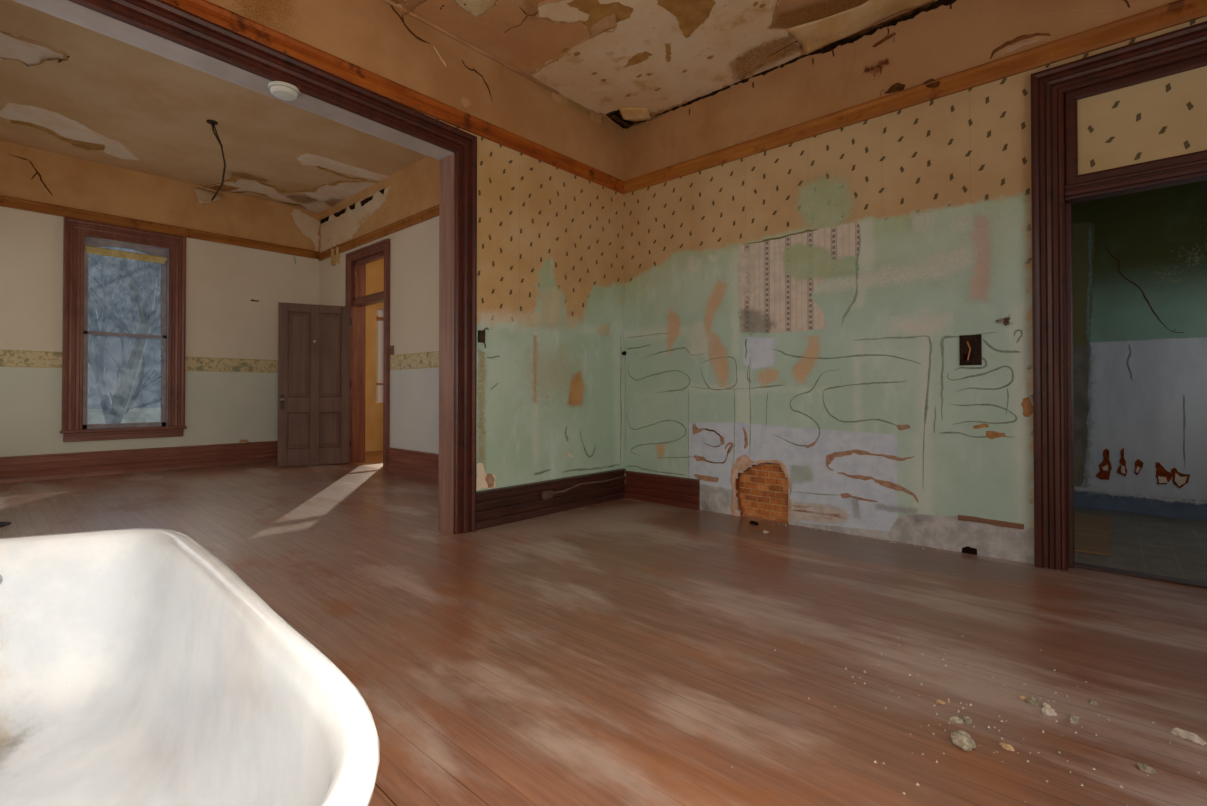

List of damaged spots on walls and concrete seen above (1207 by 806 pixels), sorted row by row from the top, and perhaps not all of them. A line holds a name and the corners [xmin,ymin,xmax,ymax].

crack [390,5,493,103]
peeling [530,0,803,128]
spalling [879,83,905,98]
peeling [0,103,138,160]
crack [9,154,53,196]
peeling [203,153,390,266]
crack [1086,225,1184,357]
spalling [973,423,1005,439]
spalling [1021,397,1033,417]
peeling [476,463,496,490]
spalling [694,427,792,523]
spalling [826,449,918,502]